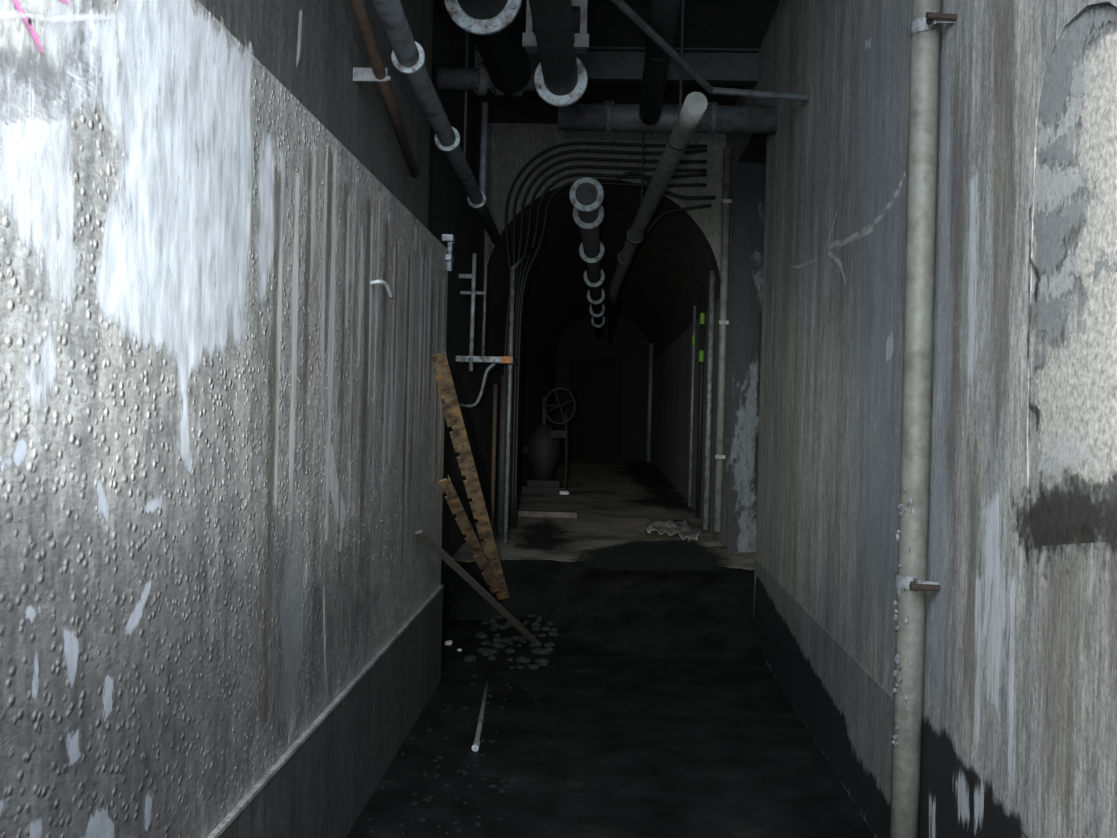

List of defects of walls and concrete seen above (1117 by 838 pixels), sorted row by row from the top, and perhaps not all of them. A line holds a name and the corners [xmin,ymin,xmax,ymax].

peeling [1037,3,1117,173]
peeling [1031,198,1085,373]
peeling [97,480,108,520]
peeling [26,606,41,623]
peeling [126,580,151,636]
leakage [974,457,1117,773]
peeling [63,629,79,688]
peeling [102,674,114,722]
leakage [754,578,891,838]
peeling [66,729,81,767]
leakage [918,718,1022,838]
peeling [80,807,115,838]